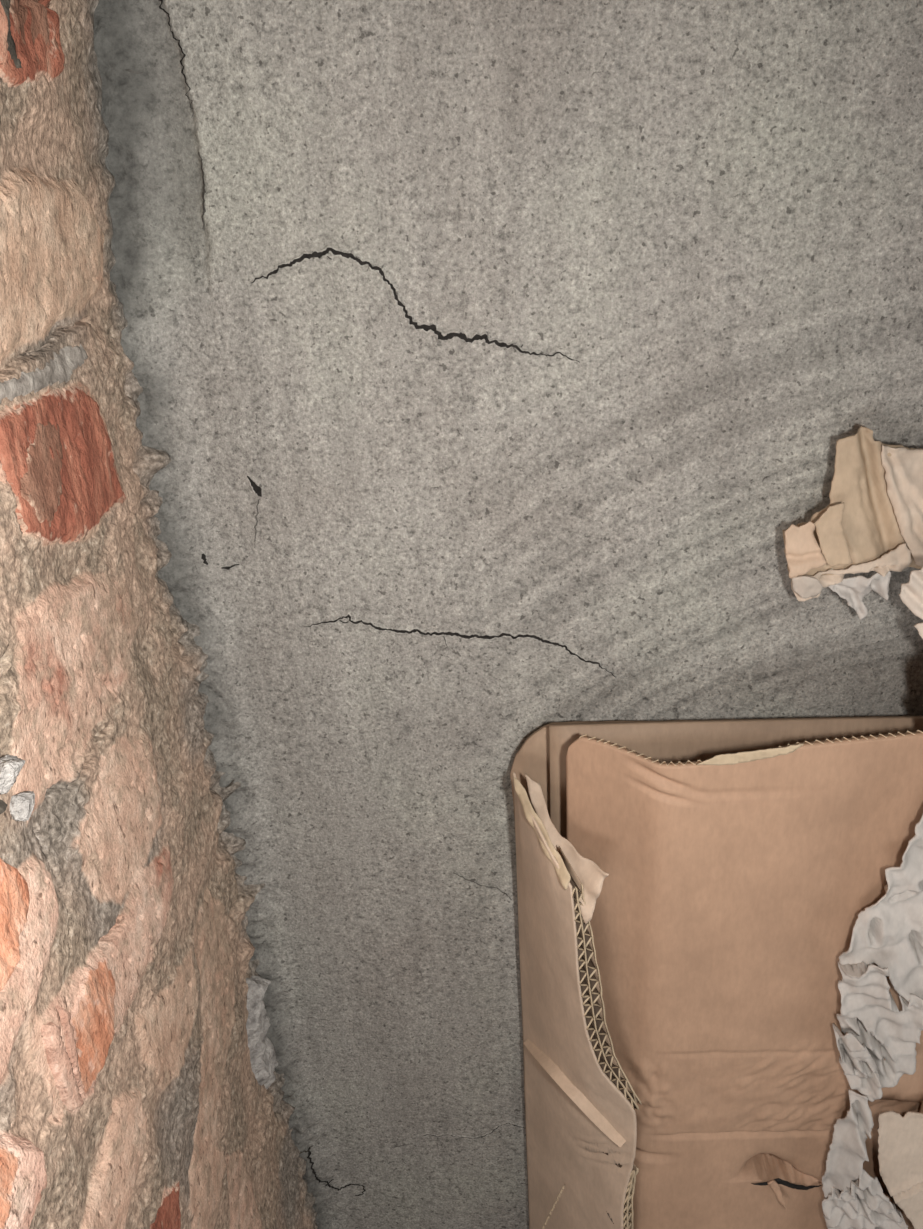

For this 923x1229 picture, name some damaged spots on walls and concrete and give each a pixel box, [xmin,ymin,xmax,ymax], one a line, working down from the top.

crack [159,0,194,116]
crack [198,152,206,229]
crack [250,245,580,363]
crack [303,613,617,678]